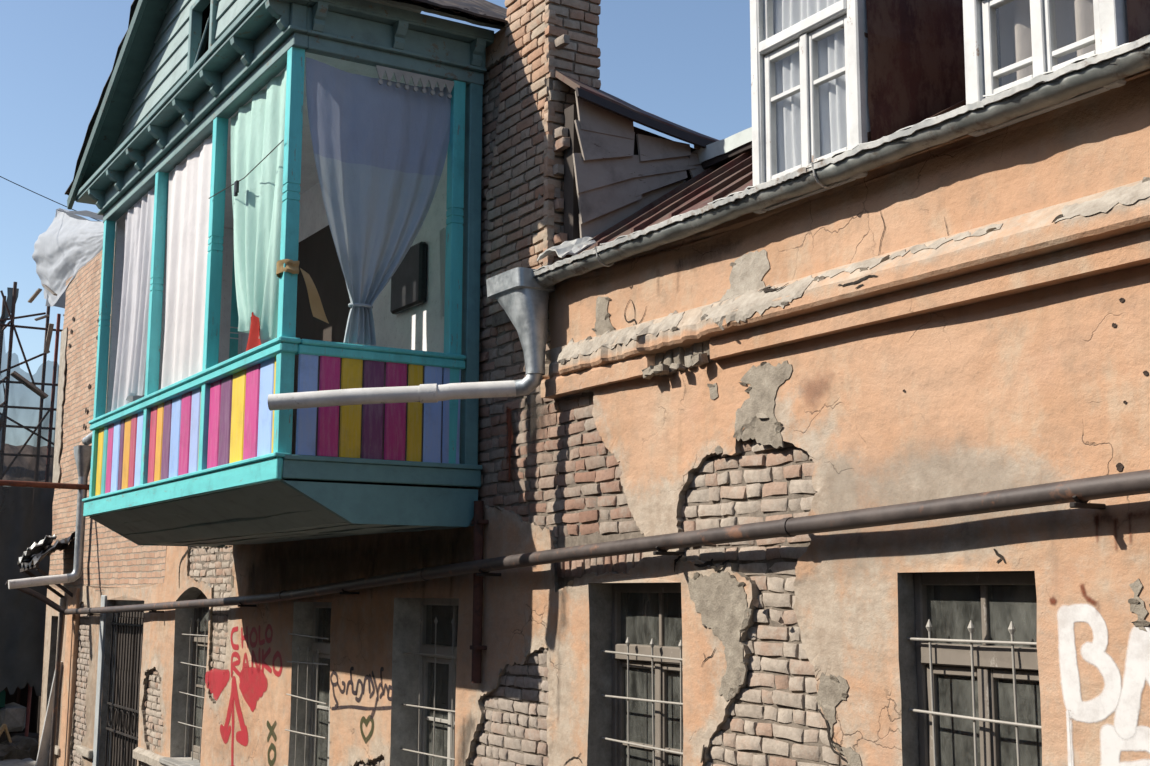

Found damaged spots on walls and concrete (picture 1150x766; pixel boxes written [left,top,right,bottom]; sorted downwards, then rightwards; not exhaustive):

flaking render [479,56,526,382]
flaking render [538,127,570,210]
crack [838,209,885,289]
flaking render [1052,177,1150,223]
flaking render [546,296,685,364]
flaking render [460,377,645,590]
flaking render [681,360,817,532]
flaking render [140,669,163,766]
flaking render [189,546,234,670]
flaking render [356,756,386,766]
flaking render [468,647,549,766]
flaking render [684,534,862,766]